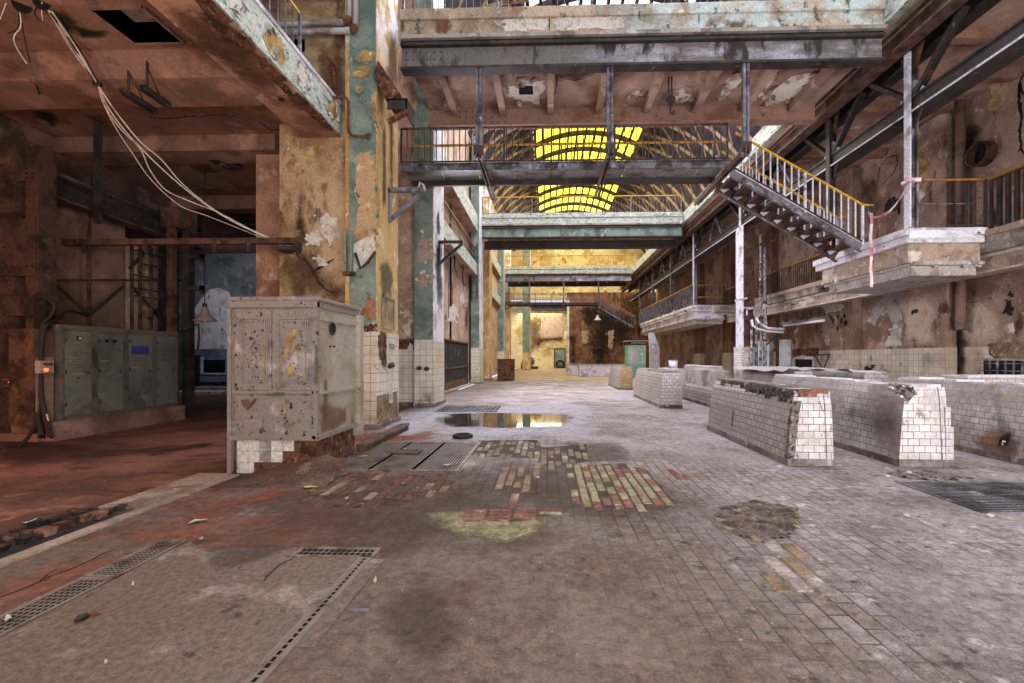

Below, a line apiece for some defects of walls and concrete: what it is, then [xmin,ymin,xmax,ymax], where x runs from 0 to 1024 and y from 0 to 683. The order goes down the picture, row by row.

spalling [195,0,340,131]
peeling [717,71,793,107]
peeling [304,212,339,267]
peeling [349,149,380,271]
peeling [857,291,919,349]
spalling [720,379,829,459]